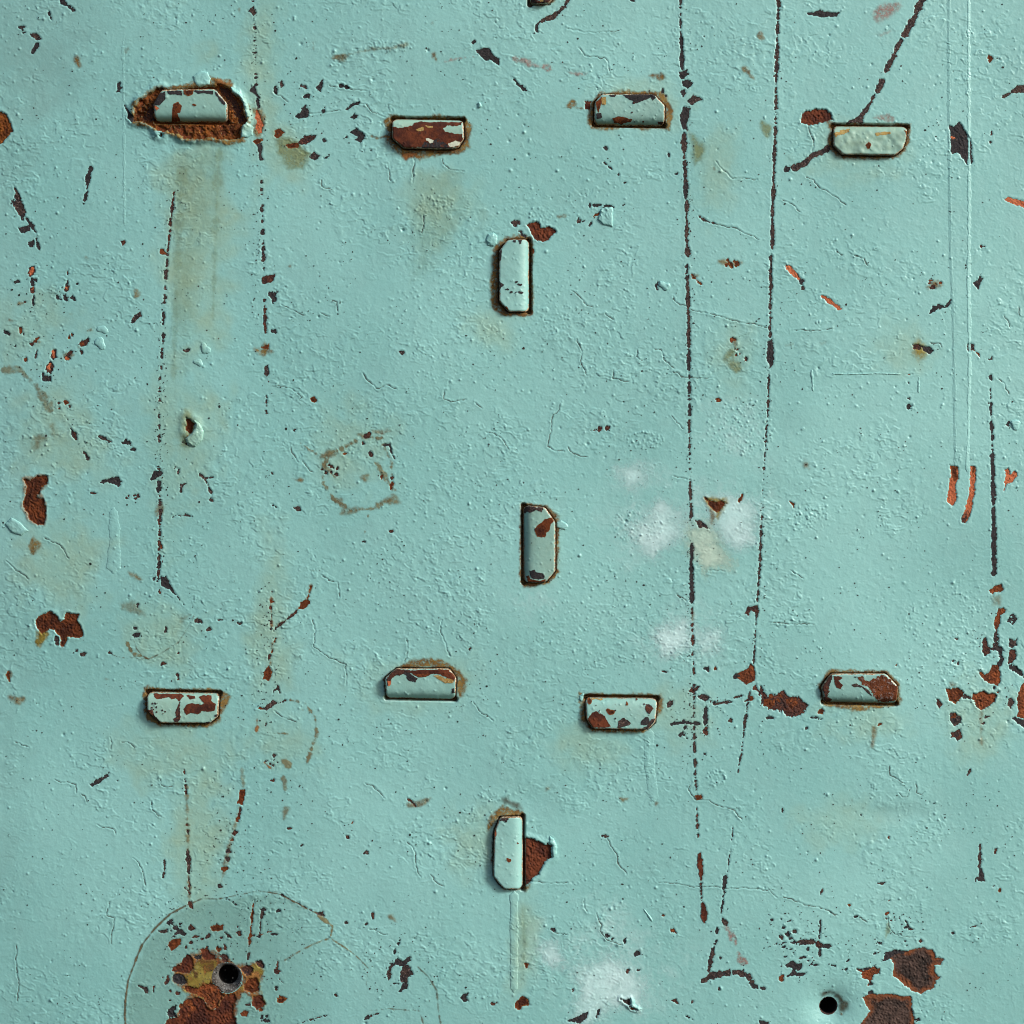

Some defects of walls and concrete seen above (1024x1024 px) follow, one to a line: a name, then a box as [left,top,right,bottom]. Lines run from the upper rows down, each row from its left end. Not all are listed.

corrosion [131,78,265,145]
corrosion [692,138,704,161]
corrosion [801,109,910,160]
peeling [924,97,993,178]
peeling [4,187,356,532]
corrosion [947,466,976,523]
peeling [656,494,823,778]
peeling [895,630,1014,742]
corrosion [165,946,266,1024]
peeling [344,895,497,1017]
corrosion [856,947,944,1024]